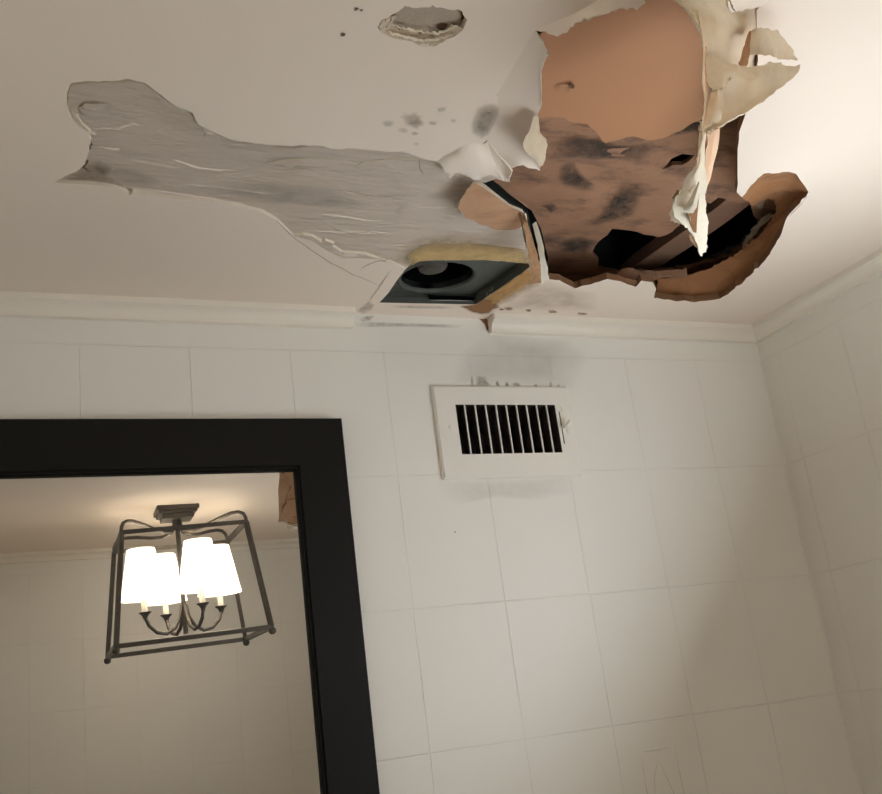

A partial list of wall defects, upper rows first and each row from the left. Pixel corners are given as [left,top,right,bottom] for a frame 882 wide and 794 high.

flaking render [378,5,465,47]
damp [408,240,527,265]